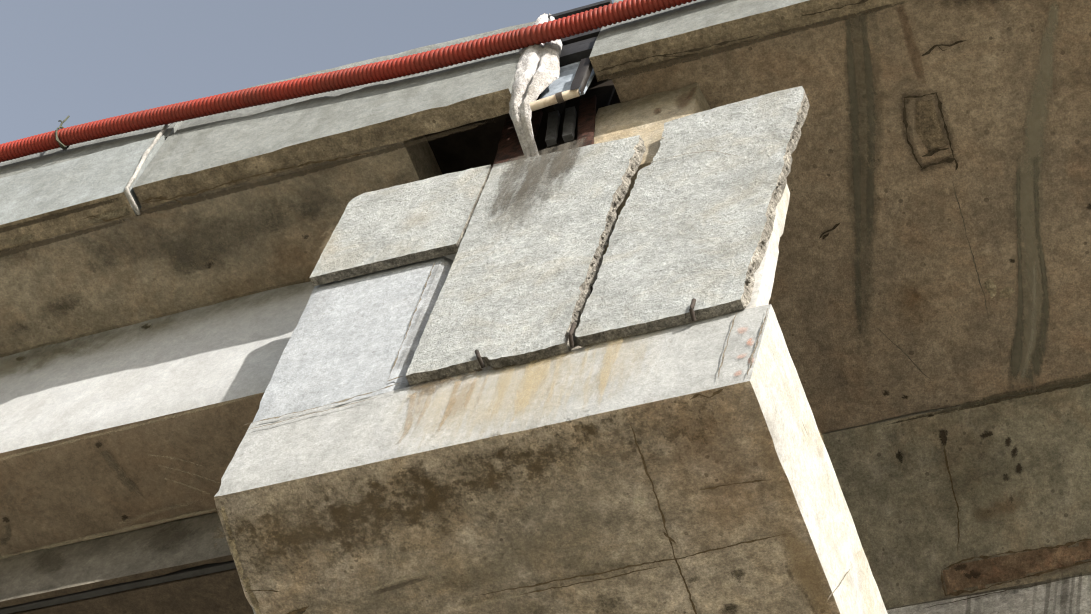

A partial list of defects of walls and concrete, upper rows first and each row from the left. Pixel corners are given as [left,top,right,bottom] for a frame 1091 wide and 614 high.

crack [922,40,966,56]
leakage [494,140,582,206]
leakage [846,15,875,319]
leakage [1010,4,1058,383]
crack [476,421,796,614]